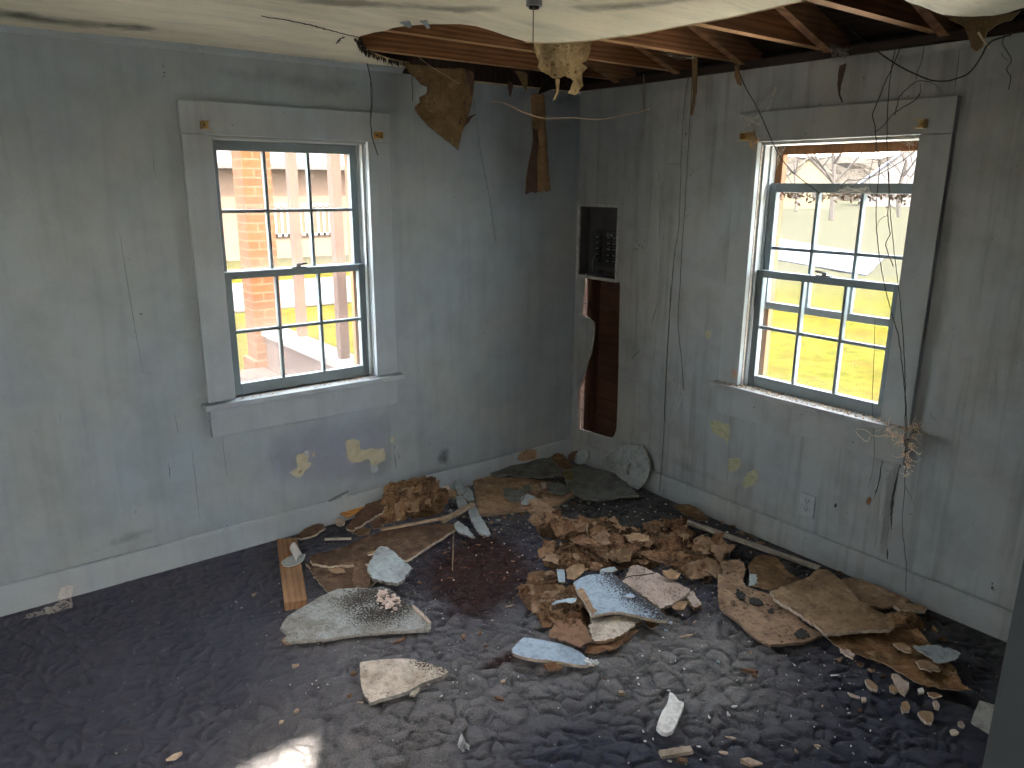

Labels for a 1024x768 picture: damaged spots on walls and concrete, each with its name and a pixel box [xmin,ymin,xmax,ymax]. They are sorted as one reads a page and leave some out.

peeling [289,450,316,478]
peeling [345,437,394,473]